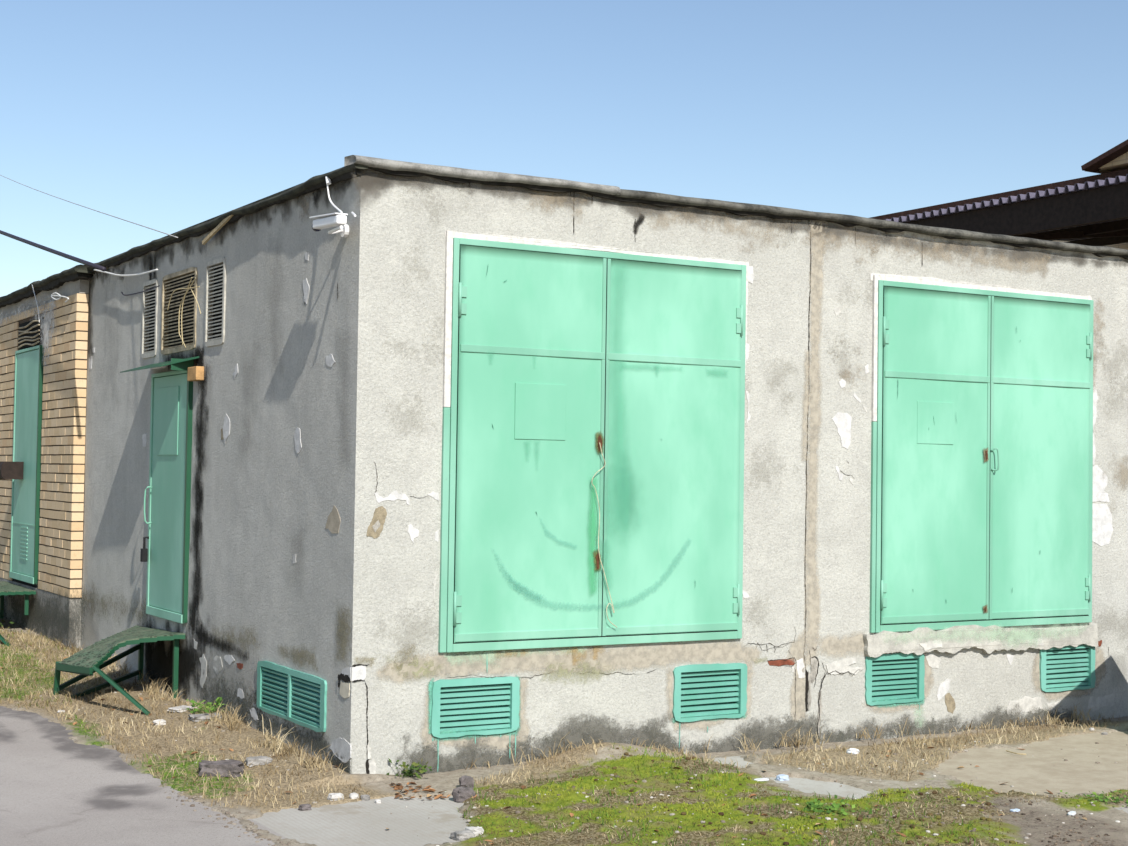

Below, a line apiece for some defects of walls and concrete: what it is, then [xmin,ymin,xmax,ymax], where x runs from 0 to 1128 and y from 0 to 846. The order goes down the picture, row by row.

spalling [366,462,439,539]
crack [745,211,813,715]
flaking render [832,412,855,485]
flaking render [1092,384,1113,546]
leakage [144,367,352,774]
flaking render [755,623,1109,739]
leakage [397,705,1077,774]